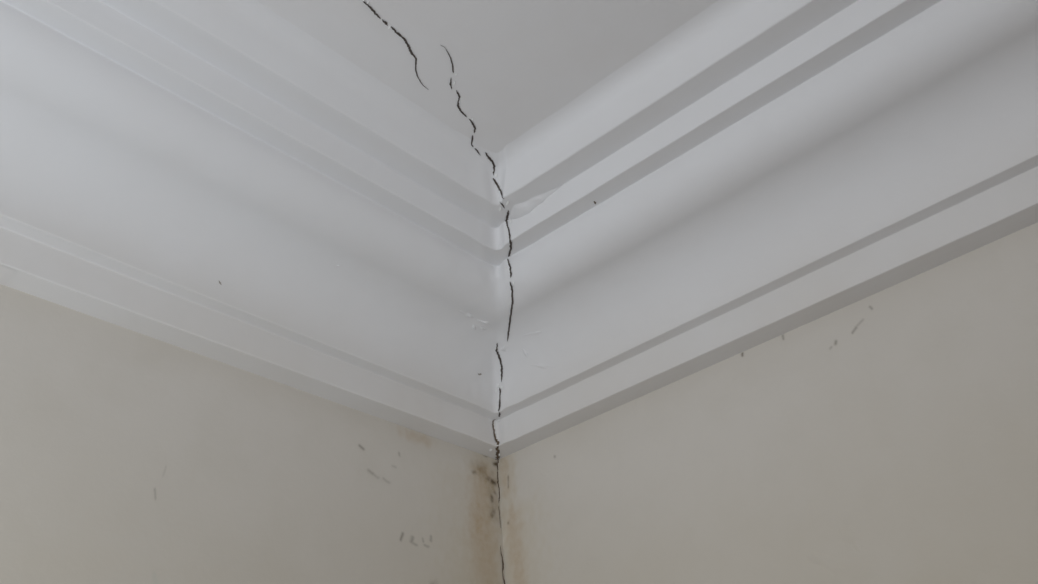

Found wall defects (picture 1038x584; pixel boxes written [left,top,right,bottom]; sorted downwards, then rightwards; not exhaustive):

crack [362,0,515,584]
water stain [390,424,574,584]